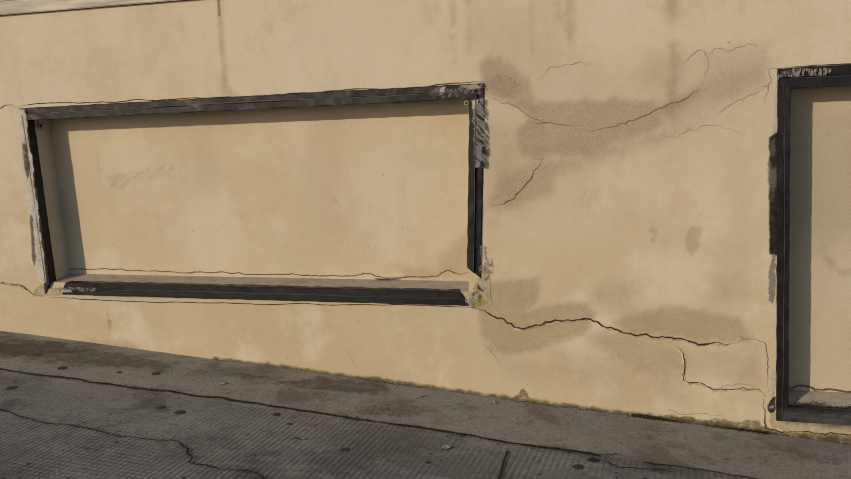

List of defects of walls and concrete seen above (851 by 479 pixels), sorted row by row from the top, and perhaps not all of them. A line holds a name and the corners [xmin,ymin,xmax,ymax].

crack [1,6,231,108]
crack [286,87,376,95]
crack [425,81,707,131]
crack [0,282,35,295]
crack [69,268,468,278]
spalling [464,245,492,307]
leakage [471,281,486,308]
crack [55,297,851,435]